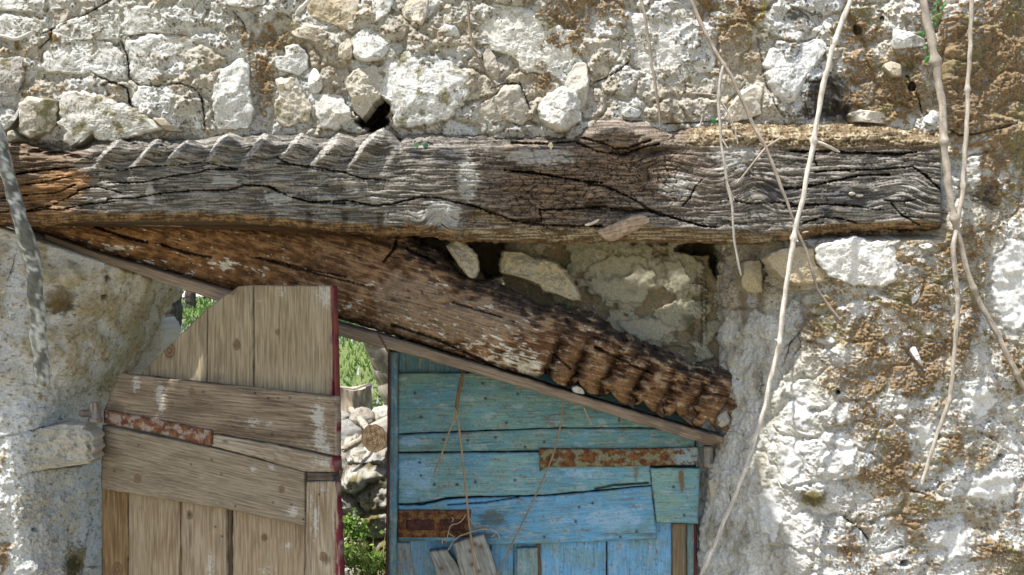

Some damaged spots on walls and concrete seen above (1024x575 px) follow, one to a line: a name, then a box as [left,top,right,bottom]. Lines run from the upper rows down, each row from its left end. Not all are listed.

crack [95,41,205,126]